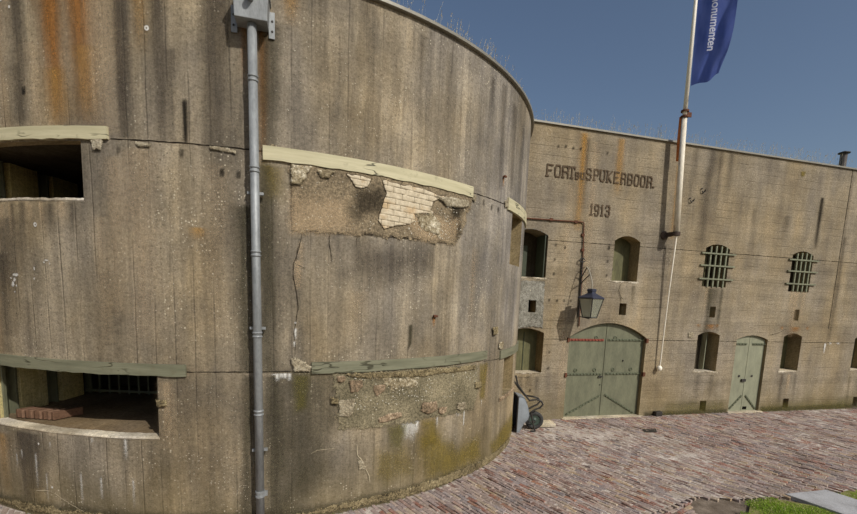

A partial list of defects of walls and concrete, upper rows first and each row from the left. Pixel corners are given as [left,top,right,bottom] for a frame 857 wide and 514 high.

damp [116,0,129,92]
spalling [291,164,335,185]
flaking render [346,173,470,237]
crack [291,184,451,350]
spalling [337,365,476,417]